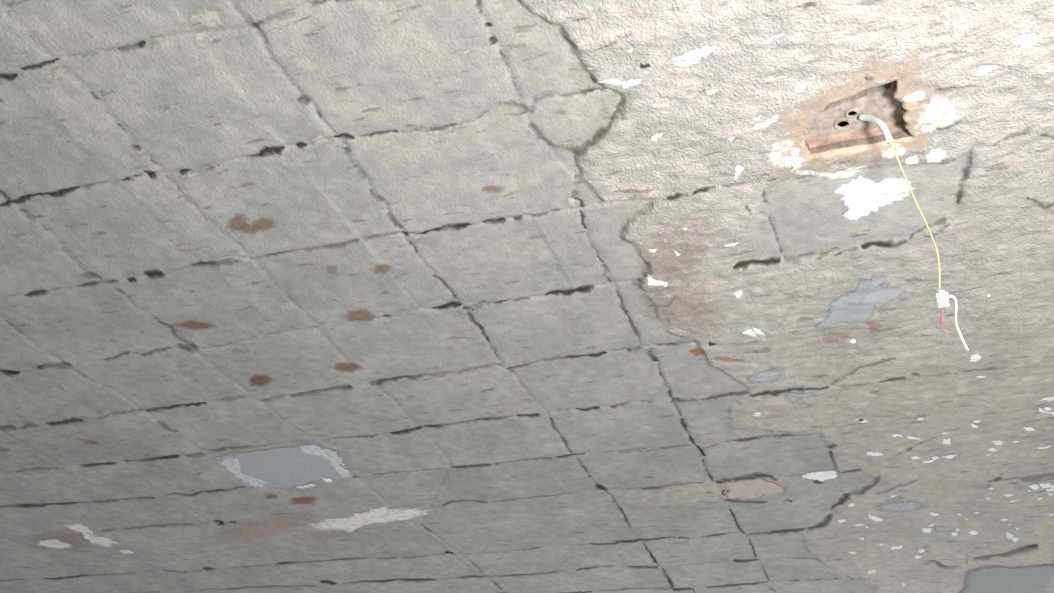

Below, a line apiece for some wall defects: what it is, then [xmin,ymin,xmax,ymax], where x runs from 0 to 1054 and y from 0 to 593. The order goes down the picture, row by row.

spalling [753,56,929,170]
crack [253,143,307,156]
crack [0,186,80,211]
peeling [834,175,915,220]
corrosion [230,216,274,233]
crack [403,217,521,252]
corrosion [349,312,371,320]
corrosion [337,363,357,371]
corrosion [251,376,269,385]
crack [517,258,880,593]
peeling [802,470,838,481]
spalling [723,478,785,500]